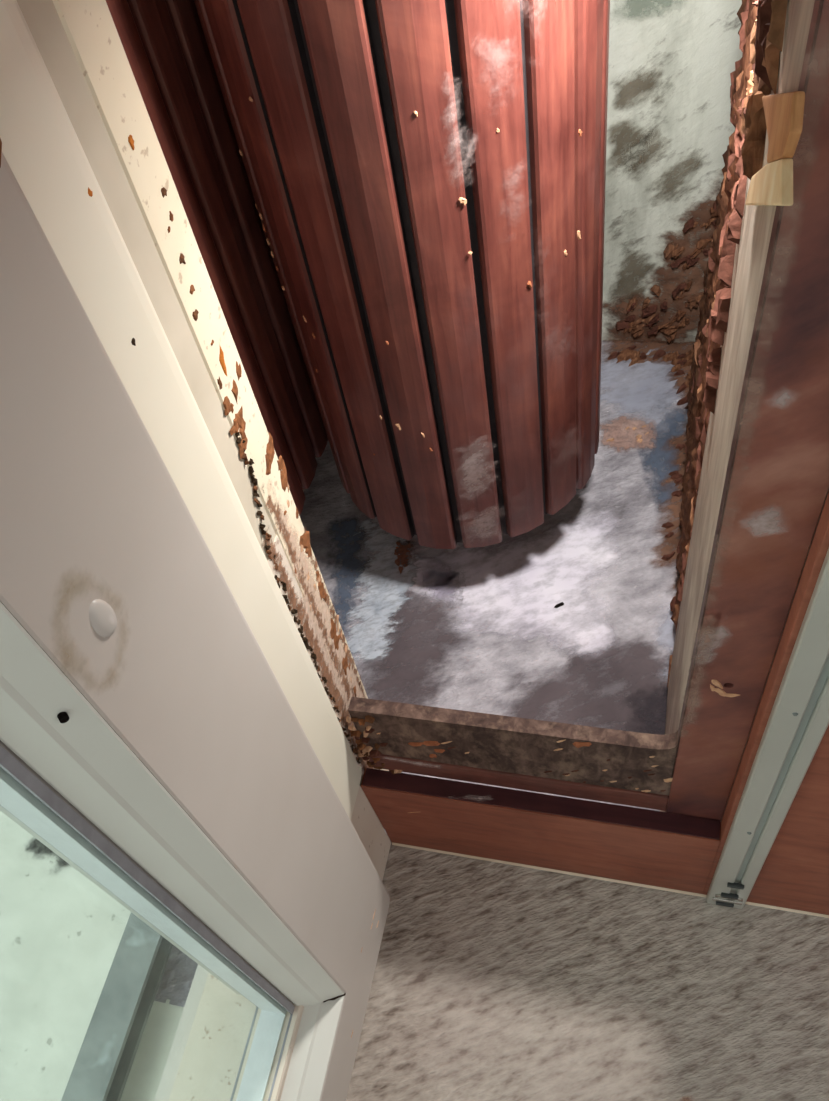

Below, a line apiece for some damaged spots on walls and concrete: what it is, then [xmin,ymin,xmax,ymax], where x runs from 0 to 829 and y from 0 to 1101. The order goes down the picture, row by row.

leakage [627,0,673,16]
leakage [615,73,661,108]
peeling [721,0,758,196]
leakage [610,122,661,172]
leakage [656,156,700,200]
peeling [262,485,374,770]
leakage [329,518,676,735]